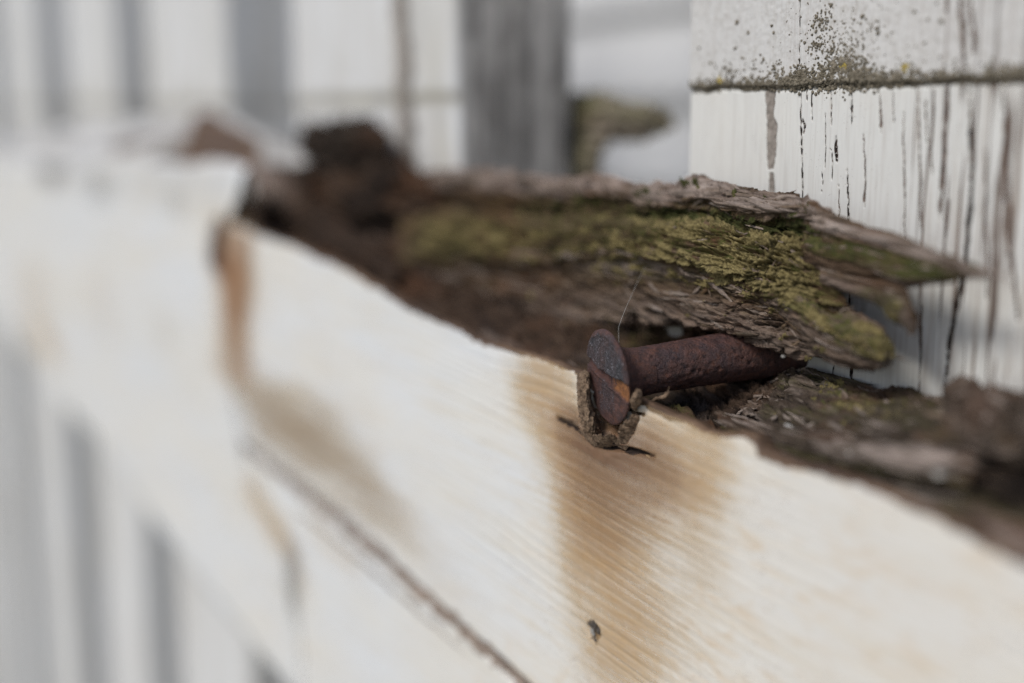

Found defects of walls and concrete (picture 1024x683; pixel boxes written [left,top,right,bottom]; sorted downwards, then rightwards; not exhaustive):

peeling [765,86,778,192]
crack [800,86,1019,391]
peeling [560,389,640,450]